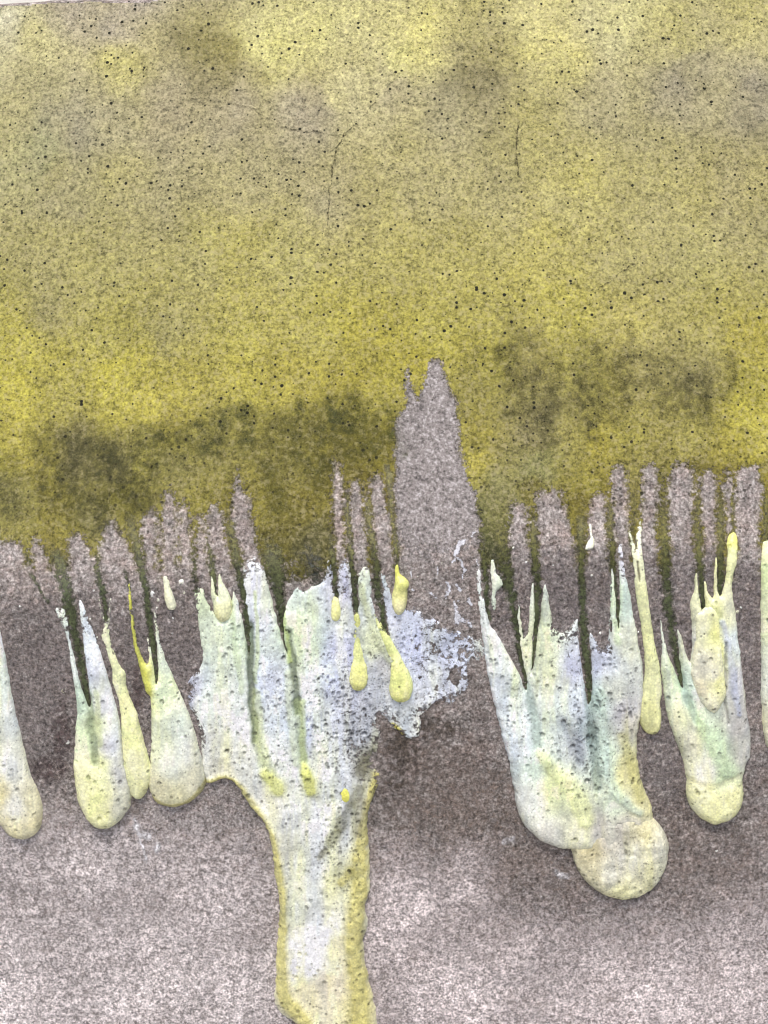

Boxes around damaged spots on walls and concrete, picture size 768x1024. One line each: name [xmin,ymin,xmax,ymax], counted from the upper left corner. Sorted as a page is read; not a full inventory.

leakage [0,439,218,790]
leakage [226,512,252,652]
leakage [261,538,287,652]
leakage [301,494,359,614]
leakage [365,499,388,635]
leakage [384,462,399,567]
peeling [392,359,482,628]
leakage [478,491,762,714]
leakage [365,701,768,1024]